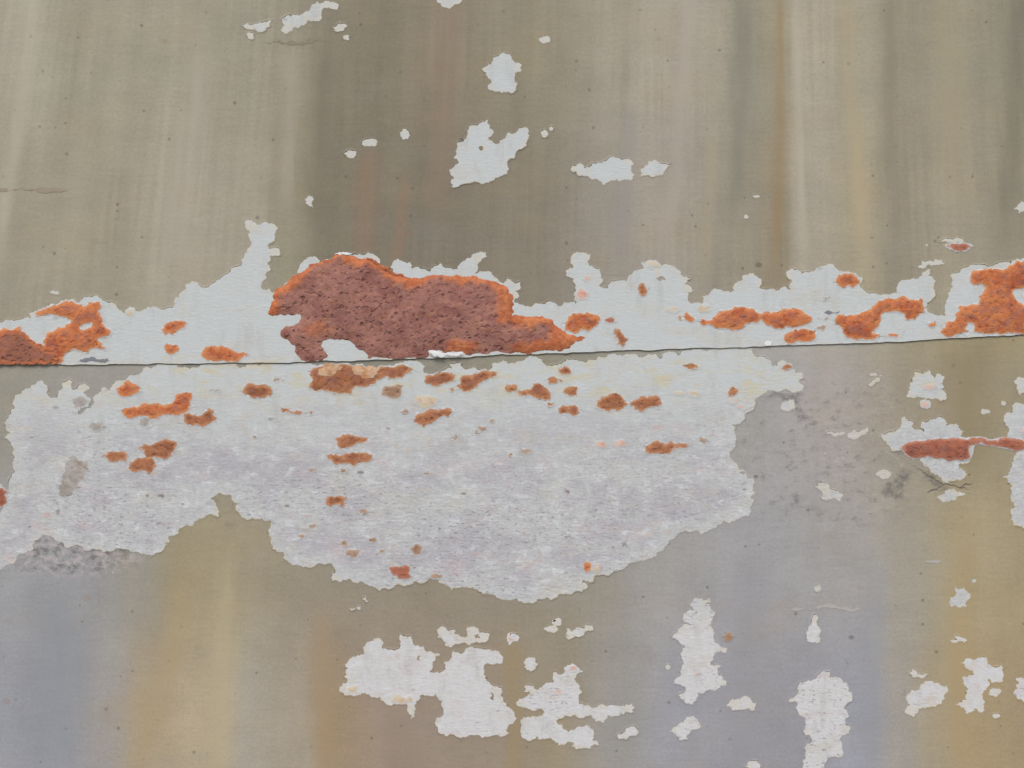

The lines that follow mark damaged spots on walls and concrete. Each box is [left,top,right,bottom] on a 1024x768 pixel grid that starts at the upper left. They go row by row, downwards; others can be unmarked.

peeling [448,118,555,190]
rust [268,0,663,428]
rust [0,299,117,365]
rust [664,259,1024,345]
rust [101,438,178,475]
rust [111,379,217,428]
peeling [0,218,1024,612]
rust [899,436,1024,462]
peeling [338,624,641,751]
peeling [663,596,728,742]
peeling [787,669,855,768]
peeling [902,655,1024,720]